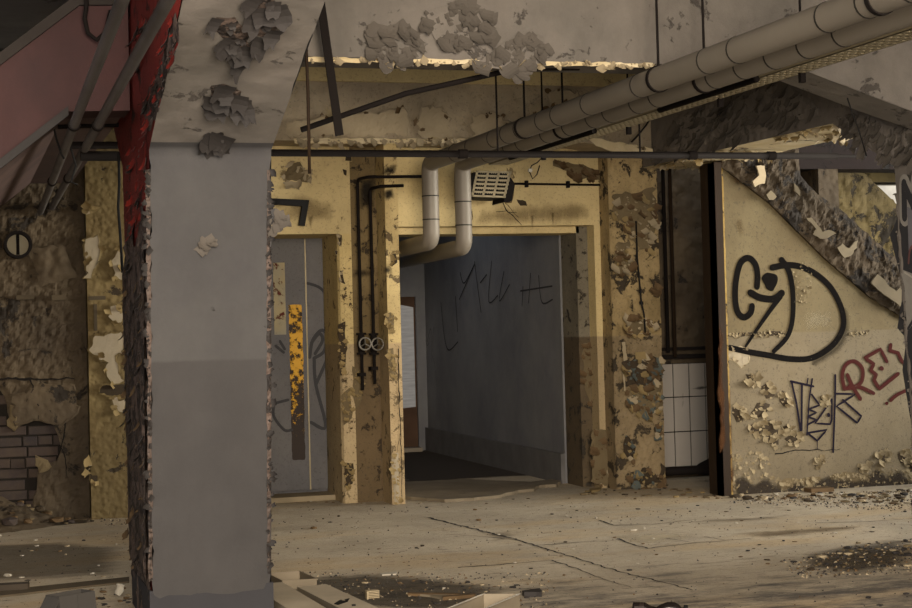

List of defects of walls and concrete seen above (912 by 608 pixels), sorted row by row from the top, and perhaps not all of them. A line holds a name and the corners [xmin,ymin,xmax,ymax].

peeling [198,0,293,160]
spalling [285,104,511,176]
peeling [308,0,656,85]
peeling [651,81,912,173]
peeling [611,187,662,278]
flaking render [0,395,60,508]
peeling [81,13,179,582]
peeling [265,160,313,574]
corrosion [288,304,305,460]
peeling [337,322,366,425]
peeling [621,353,666,441]
peeling [728,193,912,493]